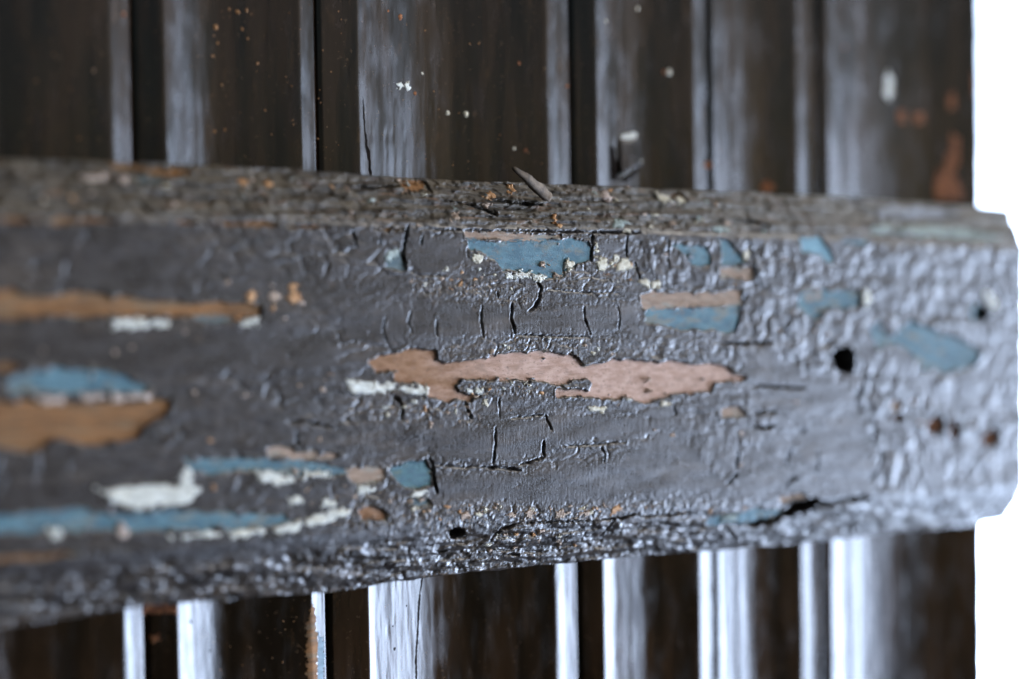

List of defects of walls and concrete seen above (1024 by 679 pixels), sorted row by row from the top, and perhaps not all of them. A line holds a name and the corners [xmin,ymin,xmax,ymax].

peeling [481,184,516,200]
peeling [653,191,686,205]
peeling [0,283,302,330]
peeling [451,211,633,283]
crack [510,268,607,337]
peeling [638,223,755,334]
peeling [0,361,170,453]
peeling [345,347,745,414]
peeling [869,319,981,374]
peeling [0,445,431,564]
crack [428,415,550,490]
crack [726,428,881,539]